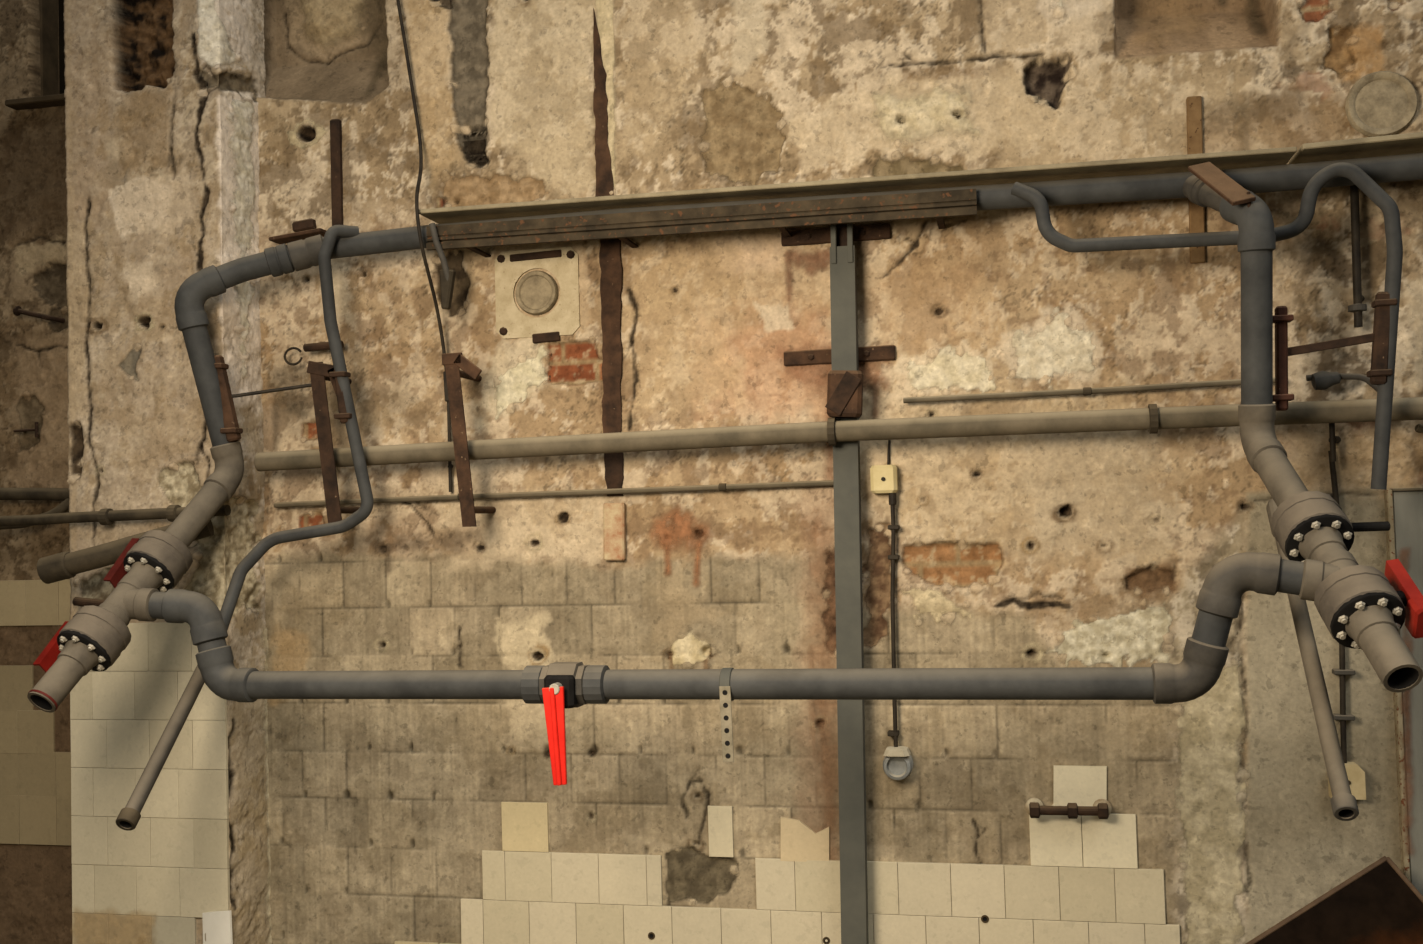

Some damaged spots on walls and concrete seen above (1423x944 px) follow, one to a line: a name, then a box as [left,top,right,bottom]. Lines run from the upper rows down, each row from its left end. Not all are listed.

spalling [118,0,176,93]
spalling [430,0,549,208]
spalling [1024,52,1078,109]
crack [171,33,217,271]
crack [24,199,100,537]
corrosion [651,510,706,584]
peeling [671,633,717,669]
flaking render [862,523,1003,648]
peeling [1050,565,1175,667]
spalling [1052,765,1107,806]
spalling [665,846,739,905]
spalling [781,817,830,862]